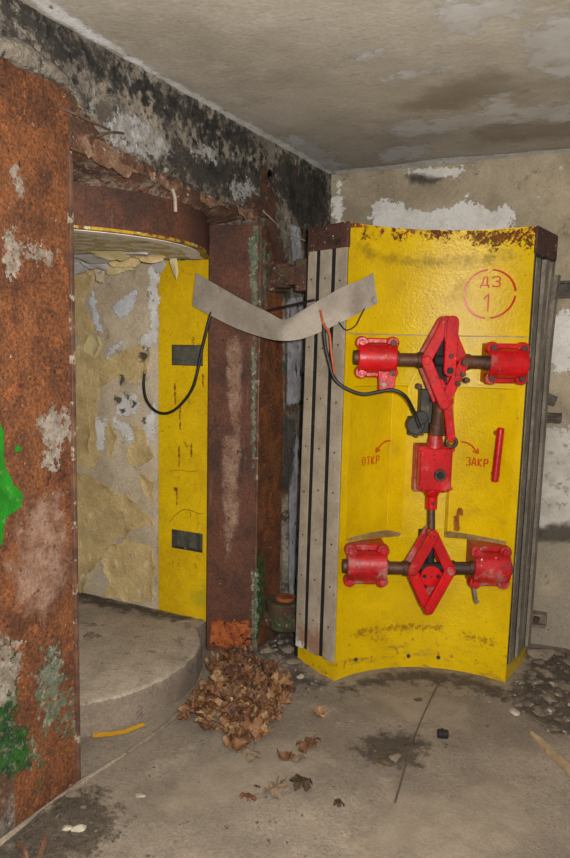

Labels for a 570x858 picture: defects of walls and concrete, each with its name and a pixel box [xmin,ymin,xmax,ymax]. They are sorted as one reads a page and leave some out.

peeling [54,104,139,178]
damp [0,0,570,266]
peeling [150,171,283,310]
peeling [367,193,516,230]
corrosion [417,228,534,257]
damp [287,297,304,319]
peeling [551,308,570,376]
peeling [33,251,178,602]
damp [281,338,305,595]
peeling [539,420,570,529]
corrosion [210,619,252,648]